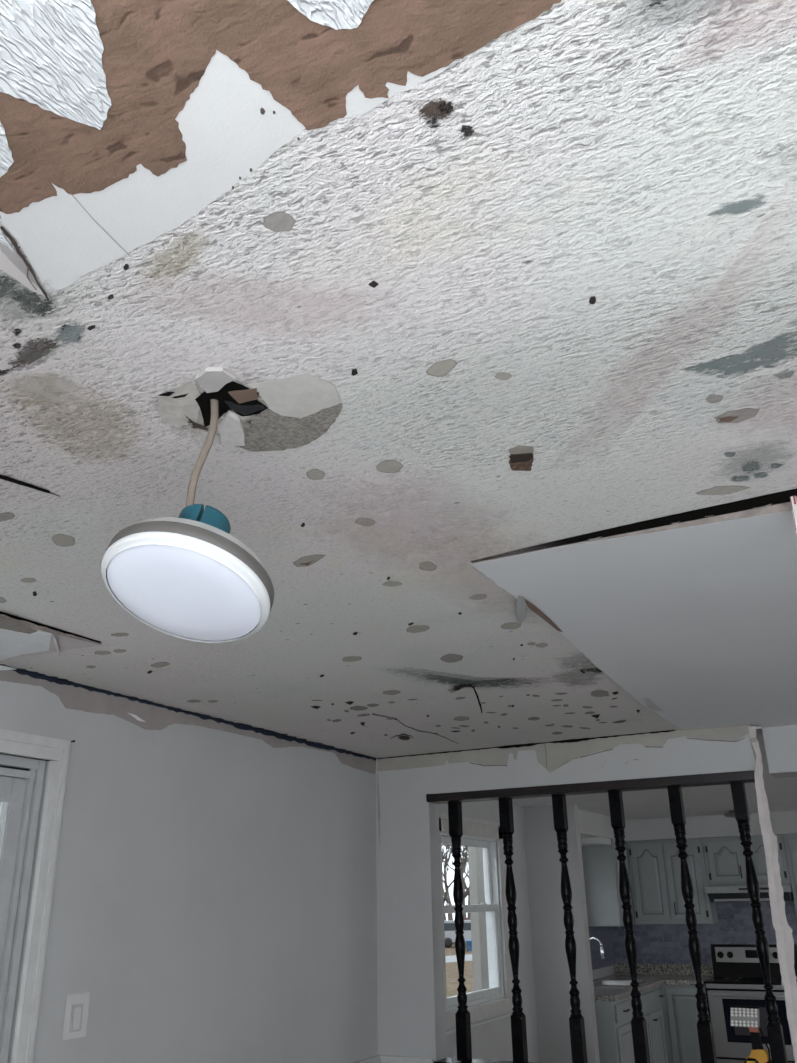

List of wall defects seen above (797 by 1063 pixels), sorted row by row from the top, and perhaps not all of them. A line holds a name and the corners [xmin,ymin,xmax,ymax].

leakage [414,98,454,128]
leakage [460,125,475,137]
leakage [712,195,766,215]
mould [0,276,56,317]
mould [0,323,85,376]
mould [685,332,797,379]
peeling [158,382,200,427]
peeling [247,373,341,418]
crack [0,475,60,497]
leakage [732,461,783,481]
leakage [428,675,519,732]
leakage [545,693,626,735]